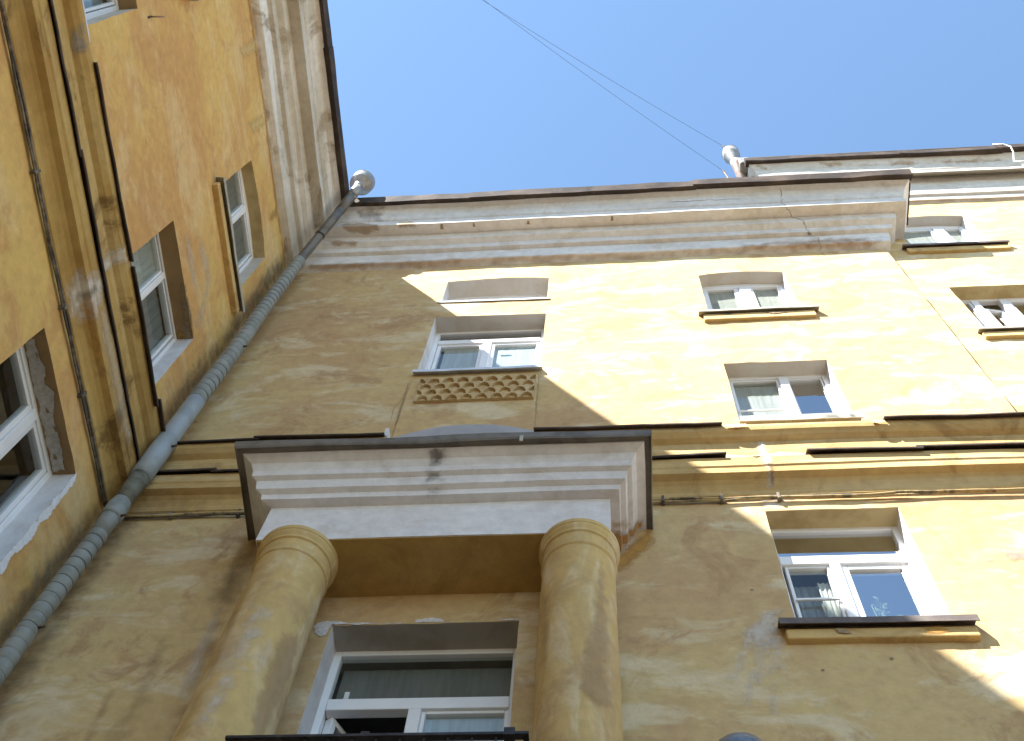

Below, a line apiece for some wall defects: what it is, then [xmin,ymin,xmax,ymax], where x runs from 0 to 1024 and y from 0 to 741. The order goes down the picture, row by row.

peeling [25,338,65,473]